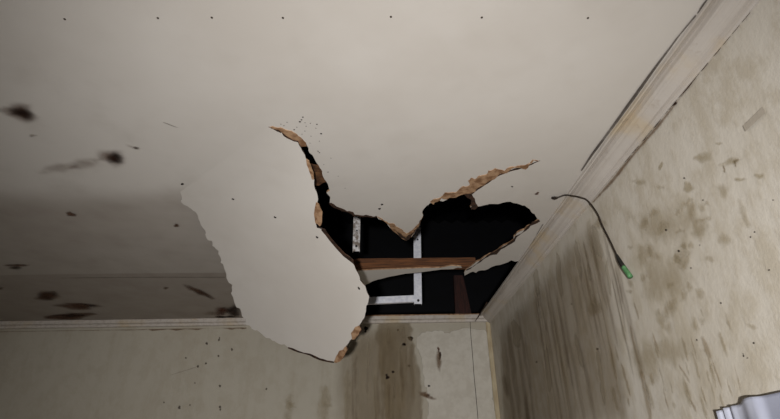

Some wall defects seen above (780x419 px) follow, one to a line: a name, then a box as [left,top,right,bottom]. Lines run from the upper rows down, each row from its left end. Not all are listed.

damp [12,107,30,118]
peeling [306,159,326,186]
spalling [314,202,423,241]
damp [47,304,96,319]
damp [217,307,238,318]
peeling [334,326,362,363]